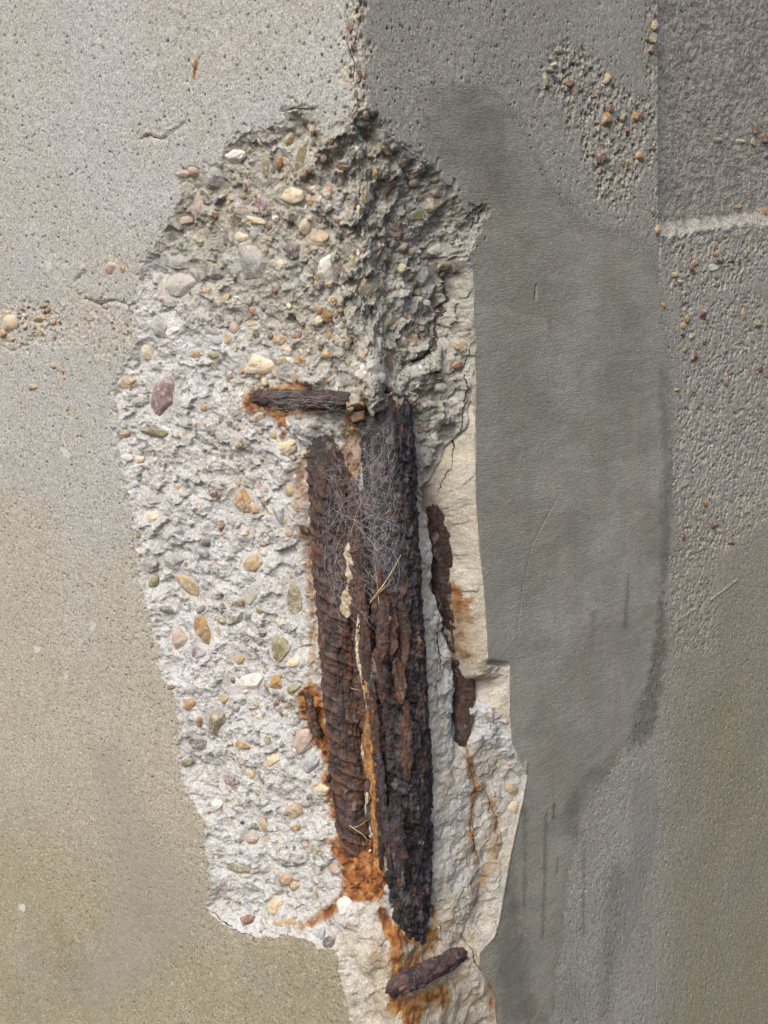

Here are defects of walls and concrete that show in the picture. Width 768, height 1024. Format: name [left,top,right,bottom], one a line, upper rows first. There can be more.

corrosion [242,390,321,437]
spalling [110,69,527,1024]
corrosion [451,582,472,619]
corrosion [297,402,439,977]
corrosion [387,983,451,1024]